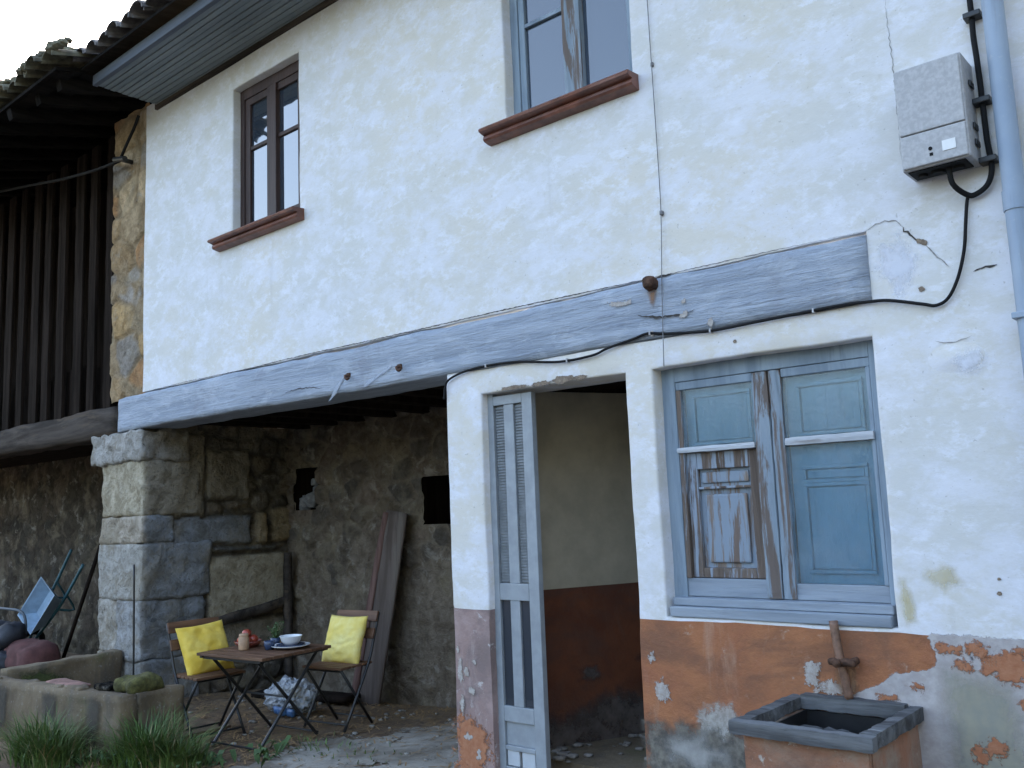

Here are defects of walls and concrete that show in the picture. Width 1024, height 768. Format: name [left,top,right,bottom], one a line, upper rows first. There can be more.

crack [153,220,948,390]
flaking render [497,375,587,391]
peeling [451,645,497,768]
peeling [654,677,672,704]
leakage [644,703,746,768]
peeling [804,633,1024,768]